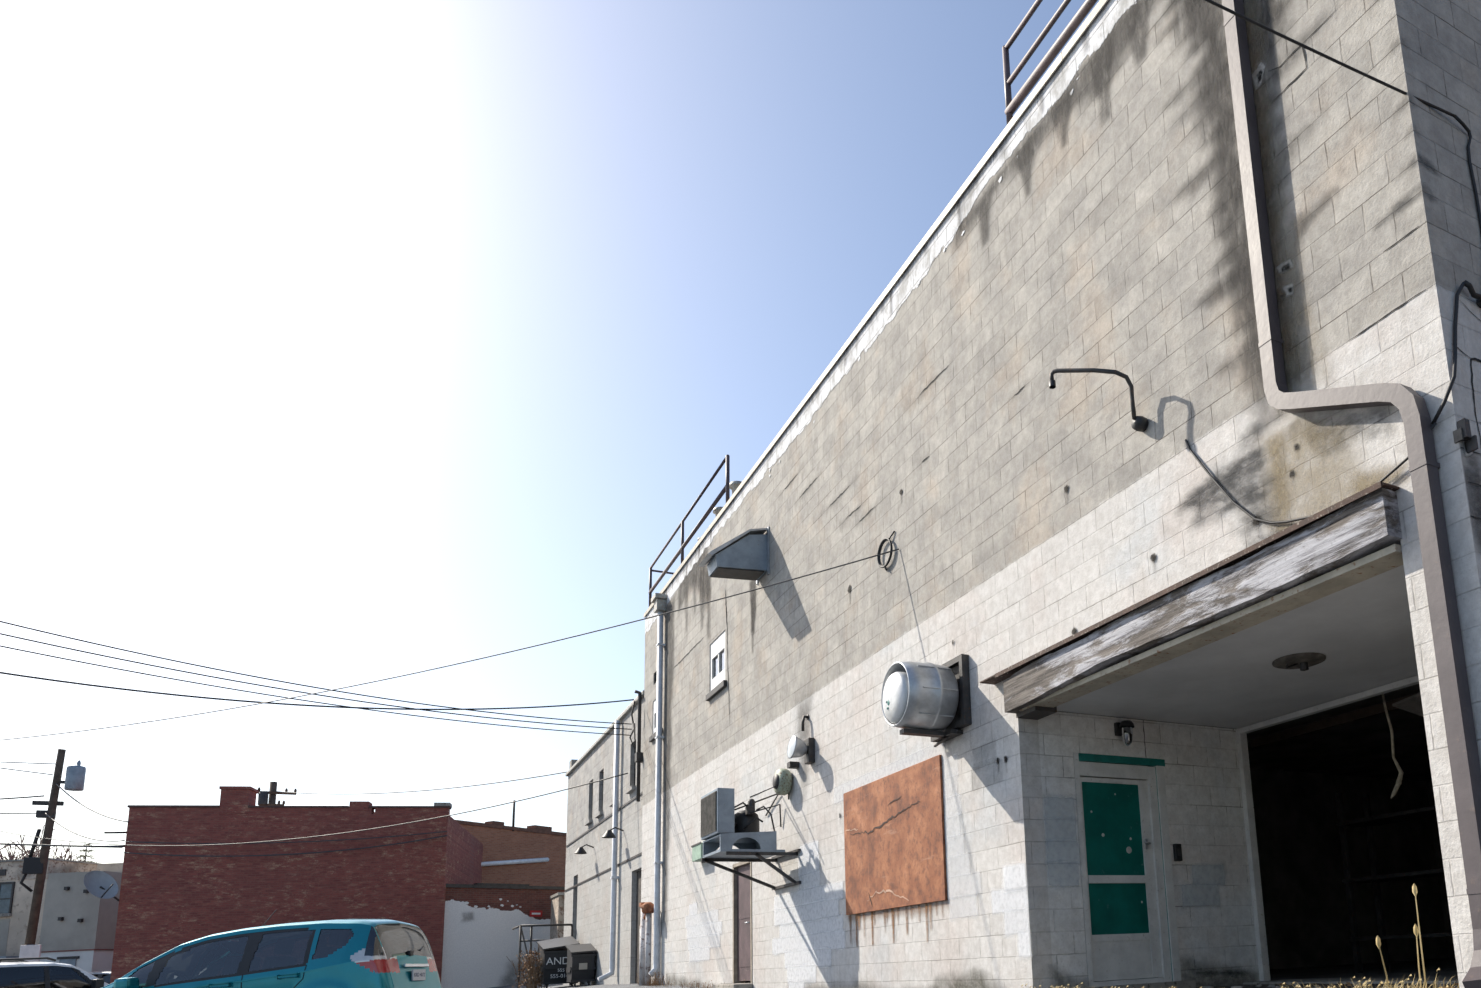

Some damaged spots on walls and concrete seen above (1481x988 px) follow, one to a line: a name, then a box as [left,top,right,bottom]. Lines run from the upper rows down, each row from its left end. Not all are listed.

leakage [958,0,1153,239]
leakage [1175,0,1265,395]
leakage [1244,0,1281,236]
leakage [1273,264,1300,391]
leakage [1354,474,1397,494]
crack [1451,309,1481,519]
corrosion [849,908,908,945]